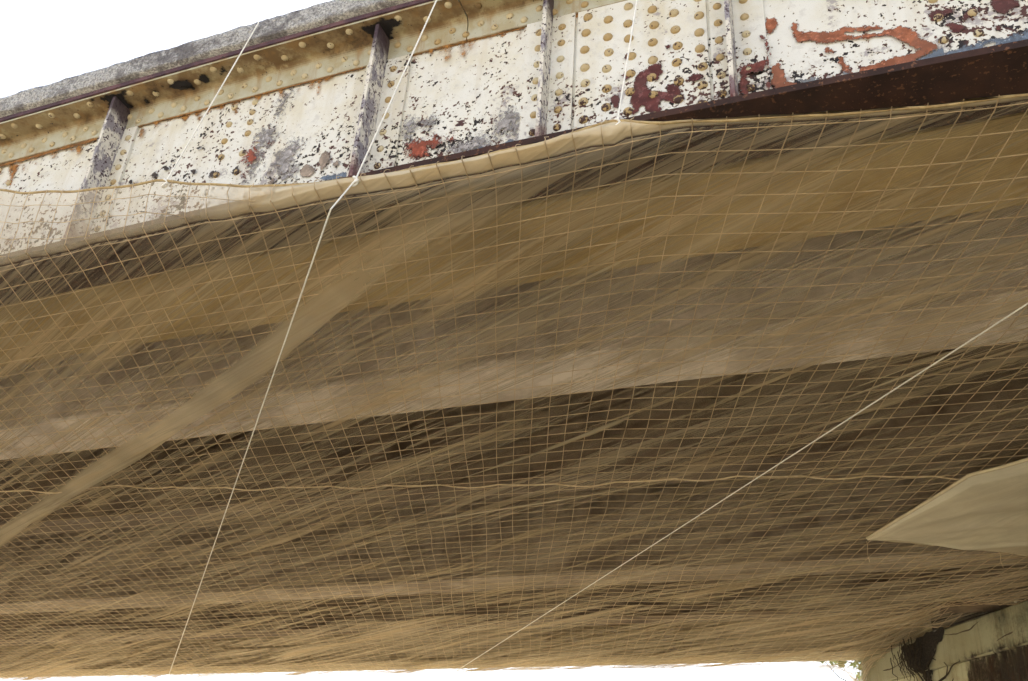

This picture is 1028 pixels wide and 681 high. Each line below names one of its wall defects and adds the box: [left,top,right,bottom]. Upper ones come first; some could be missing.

peeling [738,17,823,94]
peeling [791,18,1028,76]
peeling [928,0,1020,33]
peeling [208,88,347,184]
peeling [397,100,520,166]
damp [968,642,1028,681]